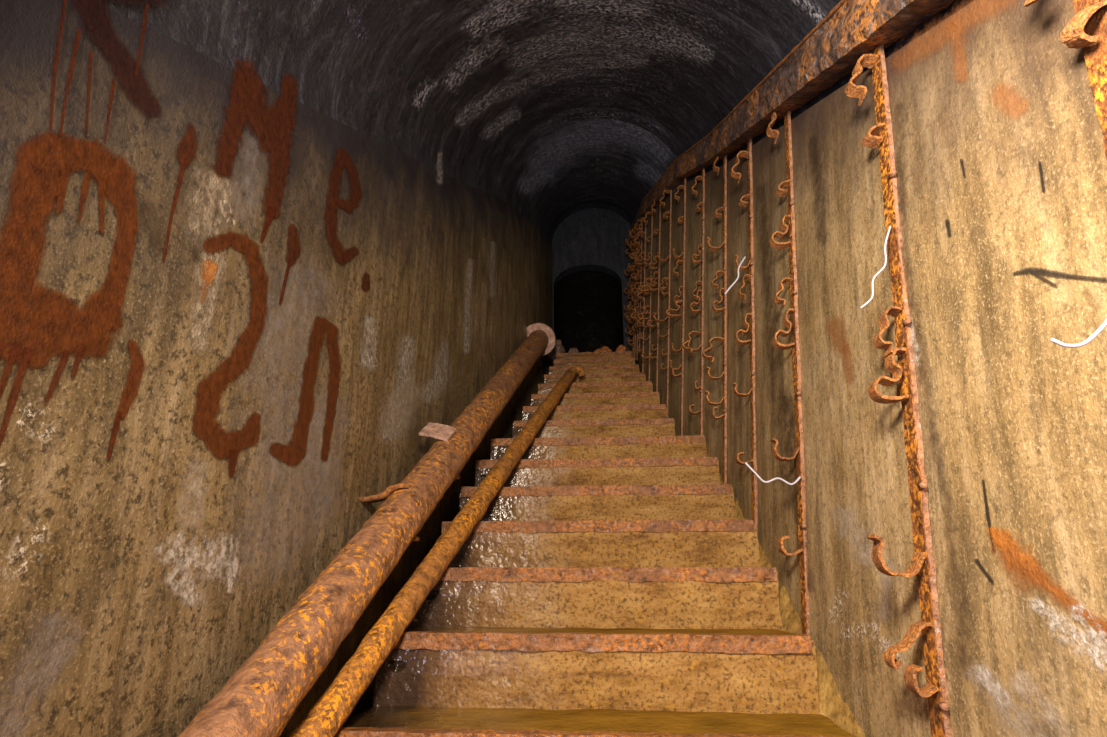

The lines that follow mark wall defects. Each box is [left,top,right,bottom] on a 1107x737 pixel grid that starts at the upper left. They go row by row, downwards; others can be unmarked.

damp [160,467,238,605]
rust [989,527,1107,635]